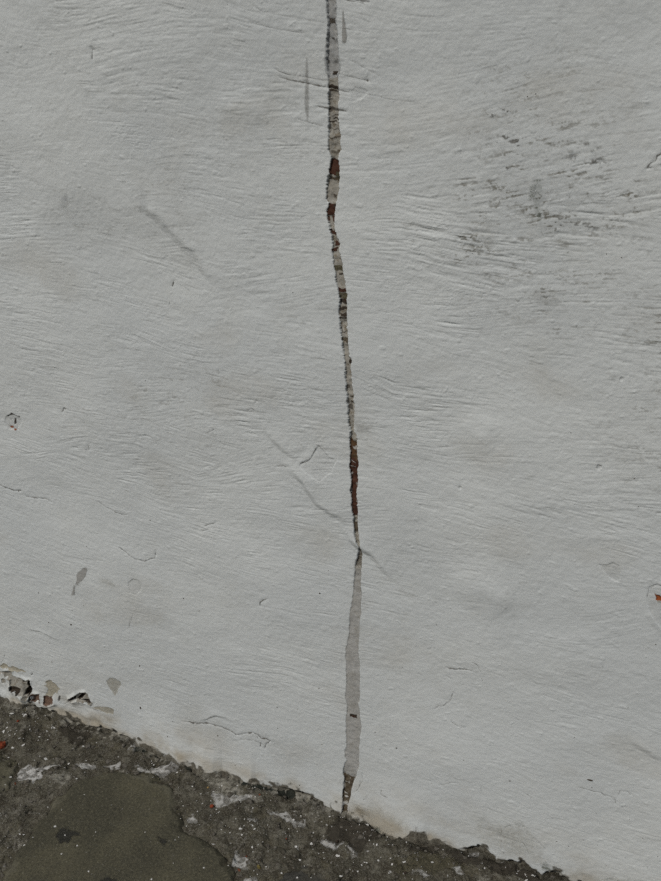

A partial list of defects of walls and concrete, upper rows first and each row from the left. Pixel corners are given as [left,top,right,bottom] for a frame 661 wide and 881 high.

spalling [0,663,114,714]
crack [324,0,363,812]